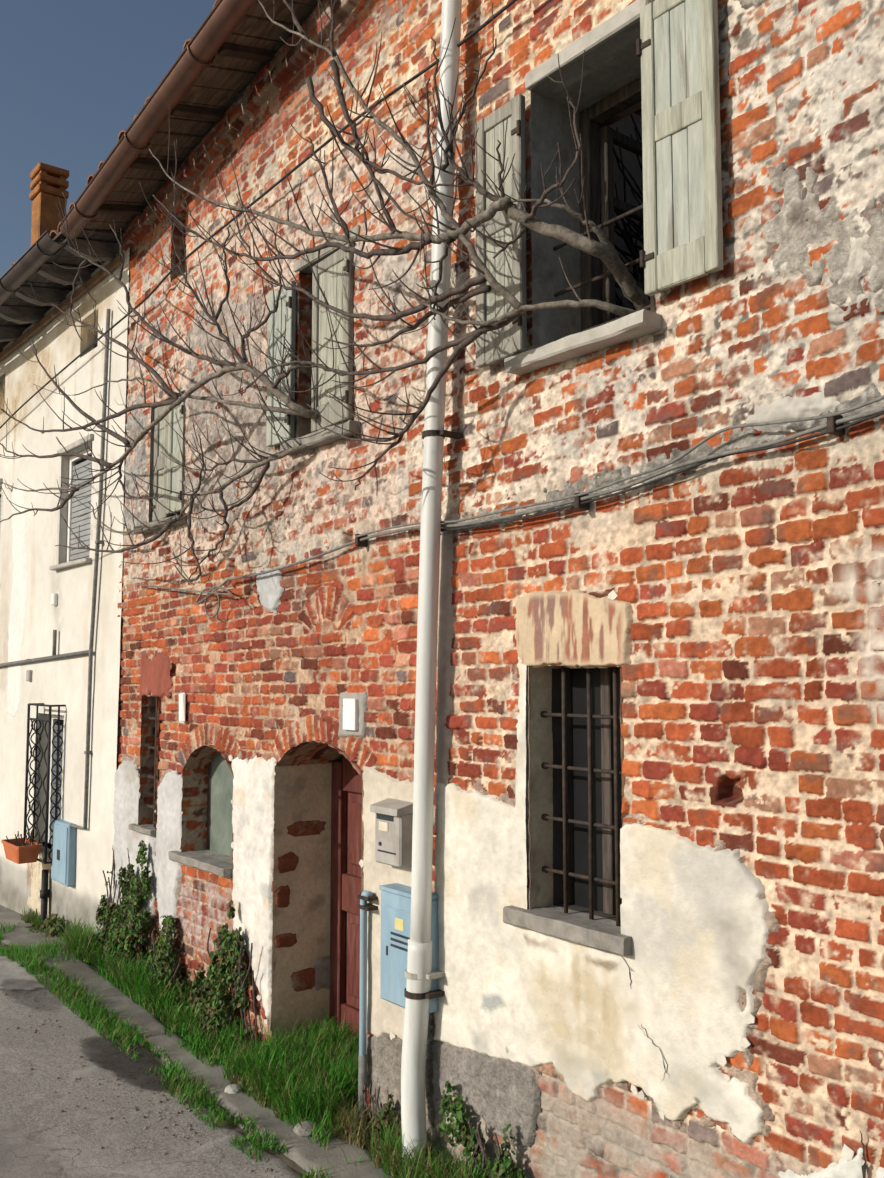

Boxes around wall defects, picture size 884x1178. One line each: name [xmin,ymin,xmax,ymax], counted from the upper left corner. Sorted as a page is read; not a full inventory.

peeling [359,766,414,1040]
peeling [426,657,781,1153]
crack [640,1025,669,1079]
peeling [842,1144,854,1160]
crack [859,1131,867,1178]